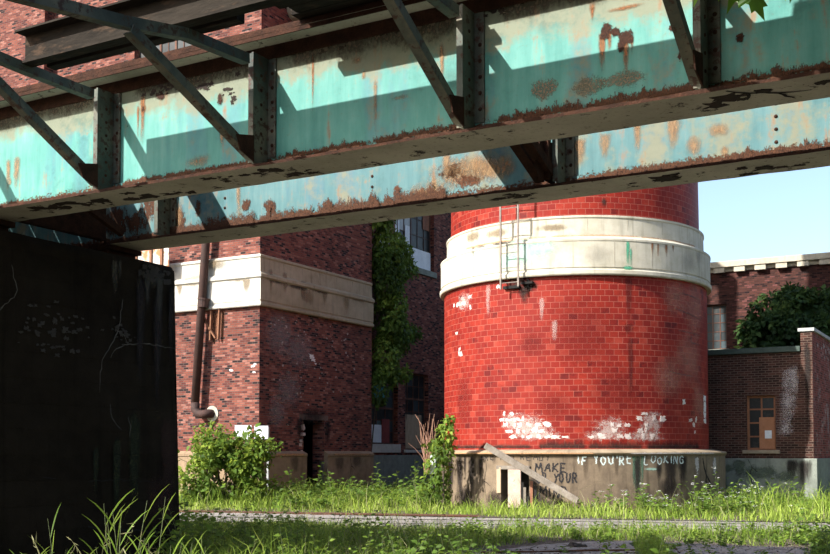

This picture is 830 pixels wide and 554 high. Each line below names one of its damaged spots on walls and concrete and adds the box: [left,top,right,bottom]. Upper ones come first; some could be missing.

rust [498,22,695,122]
peeling [702,89,773,109]
rust [285,123,458,159]
rust [722,138,830,160]
peeling [200,168,321,183]
rust [170,155,511,233]
crack [100,301,177,372]
peeling [499,411,569,439]
peeling [588,412,666,441]
damp [449,445,484,491]
damp [540,443,716,498]
damp [787,460,811,483]